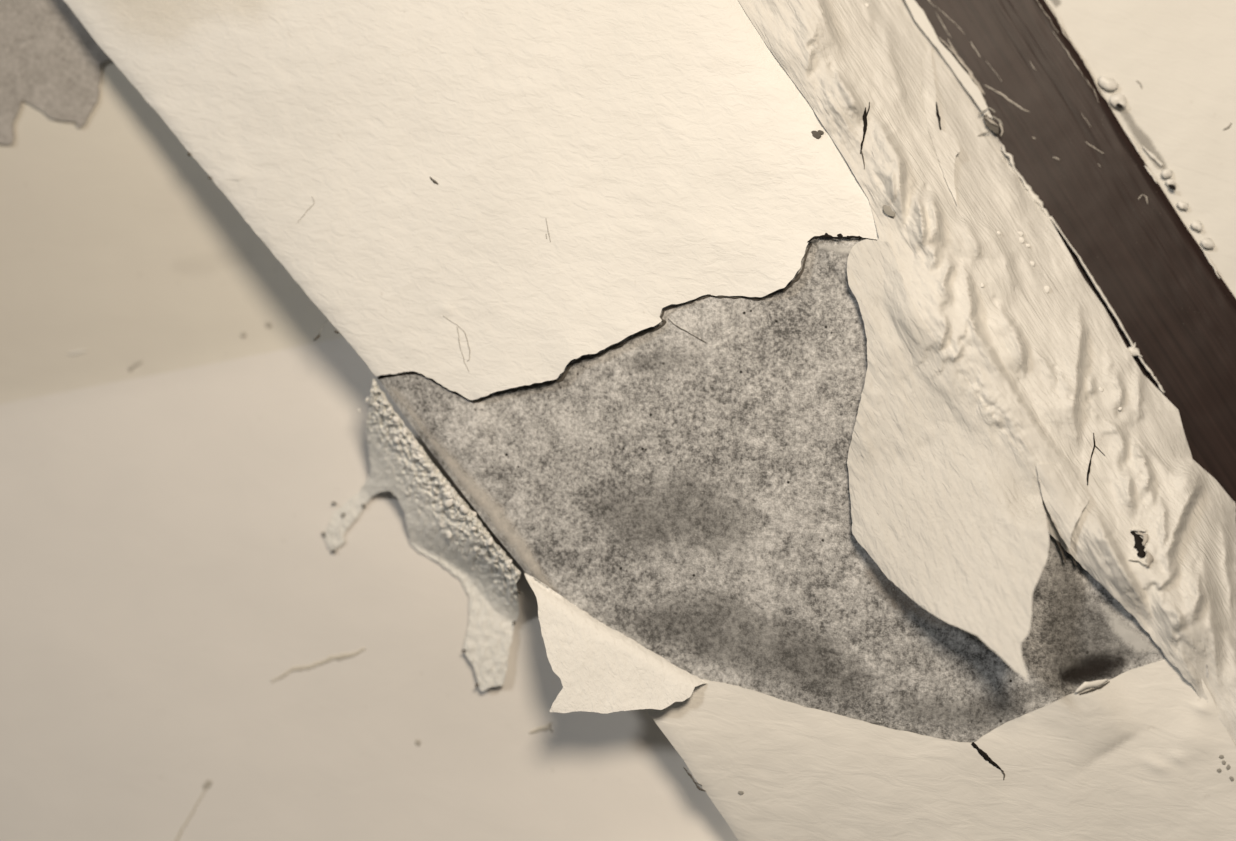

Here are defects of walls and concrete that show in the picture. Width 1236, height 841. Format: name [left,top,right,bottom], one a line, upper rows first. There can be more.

peeling [0,0,111,145]
spalling [322,233,1166,742]
crack [971,742,1005,780]